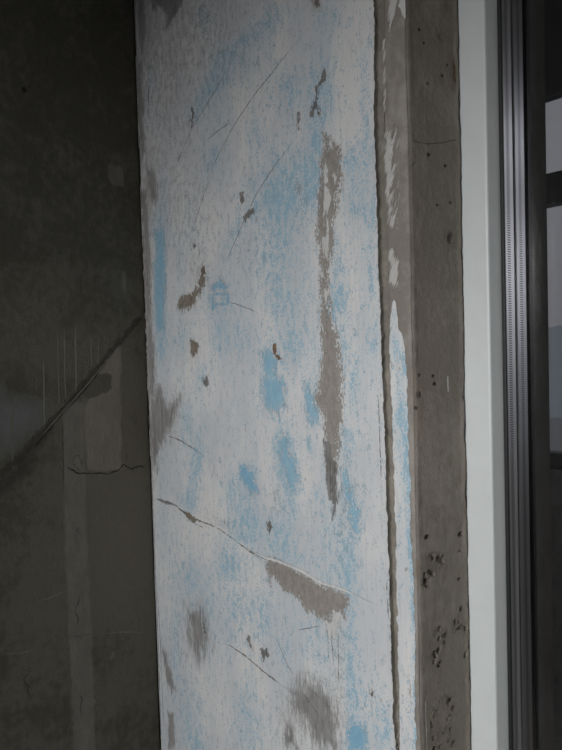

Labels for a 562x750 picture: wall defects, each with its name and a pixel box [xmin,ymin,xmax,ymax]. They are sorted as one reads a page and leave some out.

spalling [295,66,327,132]
flaking render [301,127,364,537]
crack [68,454,152,475]
crack [152,485,260,559]
crack [155,577,164,737]
flaking render [263,555,350,657]